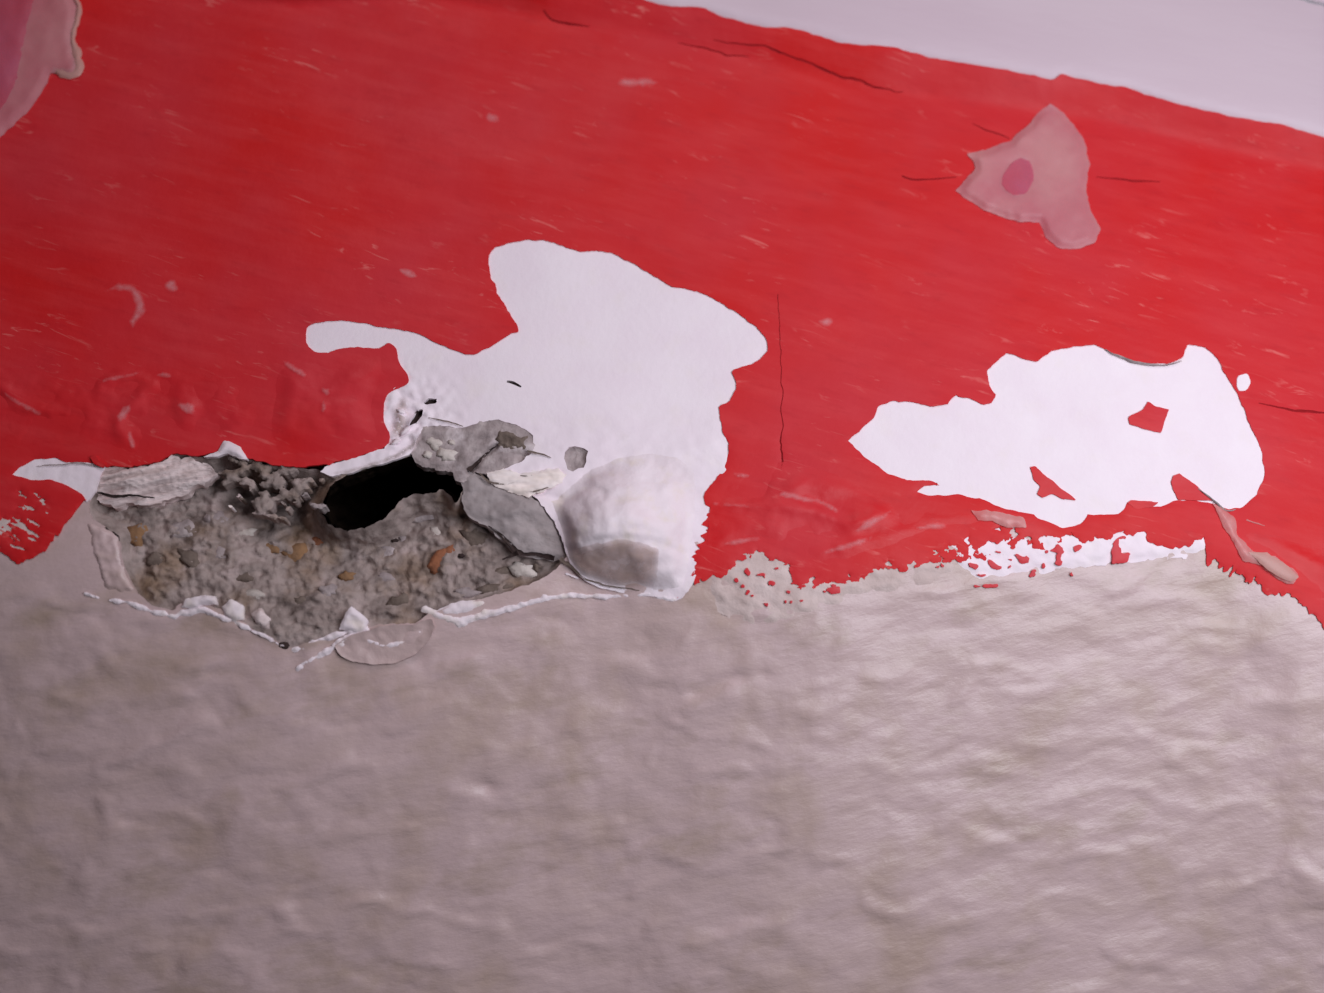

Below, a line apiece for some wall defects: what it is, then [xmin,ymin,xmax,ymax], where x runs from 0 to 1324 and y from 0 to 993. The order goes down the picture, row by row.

flaking render [0,240,1265,672]
crack [776,296,784,466]